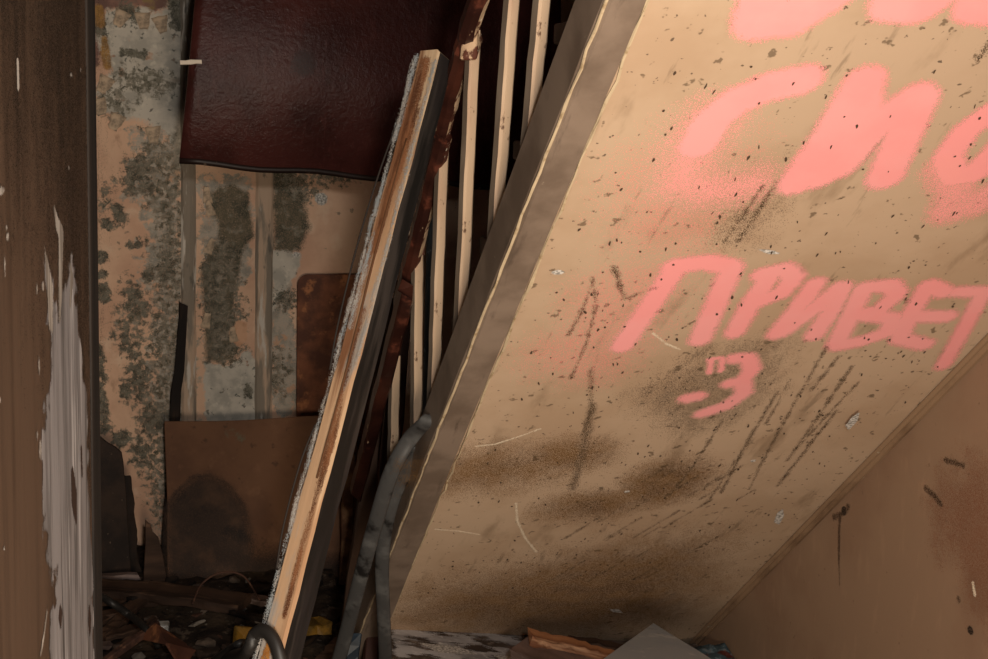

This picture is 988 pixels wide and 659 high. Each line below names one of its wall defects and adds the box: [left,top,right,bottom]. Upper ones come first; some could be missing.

peeling [36,205,94,659]
water stain [0,0,286,579]
water stain [272,281,297,418]
water stain [390,322,859,639]